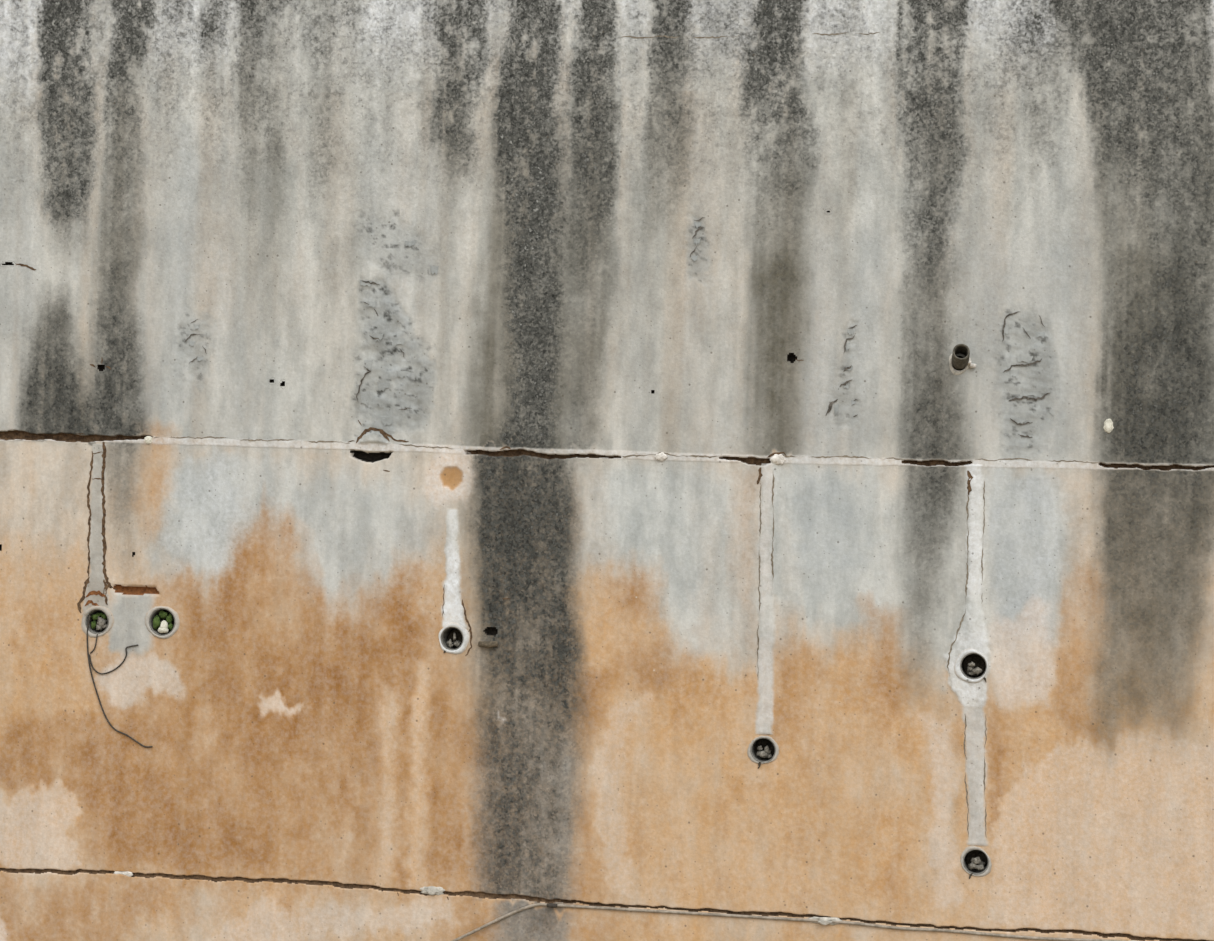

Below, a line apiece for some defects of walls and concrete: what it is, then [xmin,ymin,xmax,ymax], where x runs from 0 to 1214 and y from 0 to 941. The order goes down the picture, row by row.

rust [131,415,183,551]
damp [0,0,341,578]
peeling [349,207,445,472]
damp [357,0,1214,941]
peeling [991,302,1060,461]
damp [95,652,144,702]
rust [0,480,506,941]
rust [563,469,1214,941]
crack [0,868,1208,941]